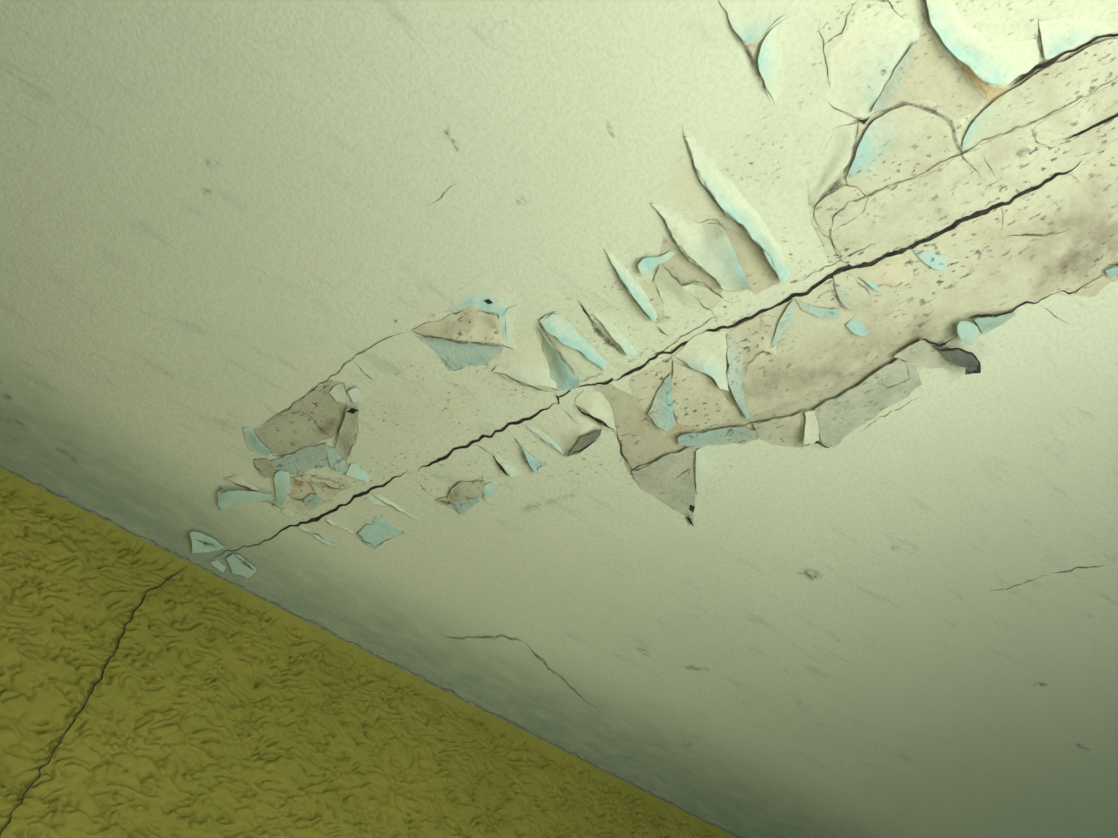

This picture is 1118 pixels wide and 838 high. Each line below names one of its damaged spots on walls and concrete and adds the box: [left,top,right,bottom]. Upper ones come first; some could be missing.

peeling [190,531,256,578]
crack [0,157,1085,838]
flaking render [217,0,1118,547]
crack [1064,114,1118,140]